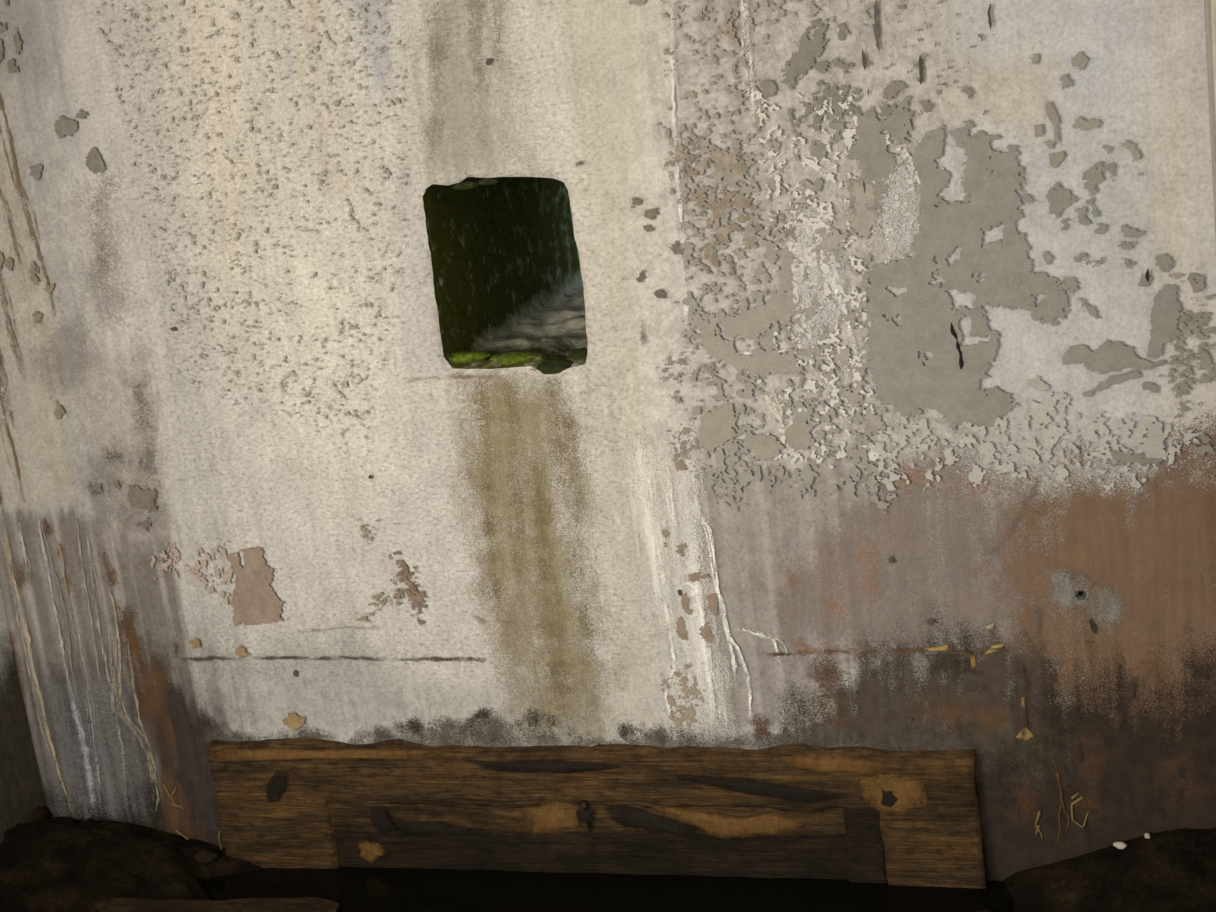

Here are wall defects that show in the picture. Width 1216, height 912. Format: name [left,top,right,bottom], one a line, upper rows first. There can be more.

water stain [669,0,687,243]
water stain [740,0,758,122]
rust [0,94,55,512]
peeling [631,197,658,232]
water stain [770,205,859,368]
water stain [858,156,921,261]
peeling [653,0,1216,514]
peeling [150,538,283,627]
spalling [357,519,381,544]
spalling [354,551,428,627]
water stain [0,358,1216,881]
rust [742,406,1216,779]